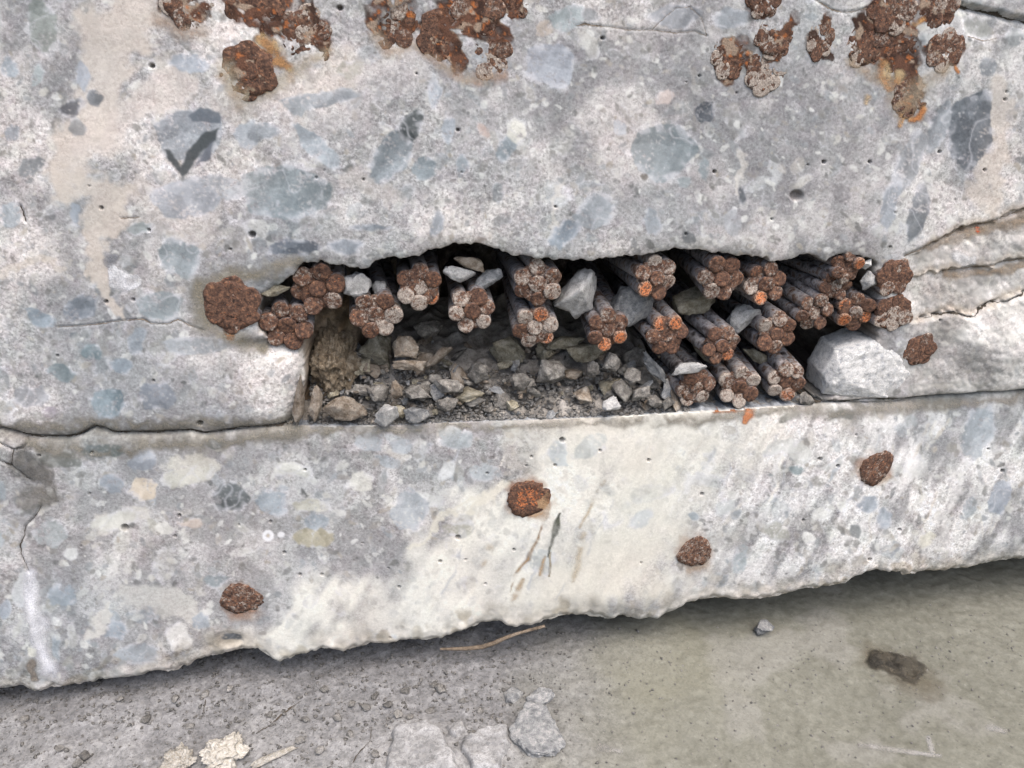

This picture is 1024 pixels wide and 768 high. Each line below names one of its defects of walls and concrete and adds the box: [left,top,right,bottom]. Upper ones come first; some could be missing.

corrosion [222,0,331,72]
corrosion [430,0,523,73]
corrosion [807,13,834,61]
corrosion [852,0,966,127]
crack [905,208,1024,256]
spalling [259,267,299,311]
spalling [437,242,504,297]
spalling [850,255,880,299]
crack [919,292,1023,318]
crack [943,258,1023,271]
spalling [301,294,368,400]
spalling [767,299,845,399]